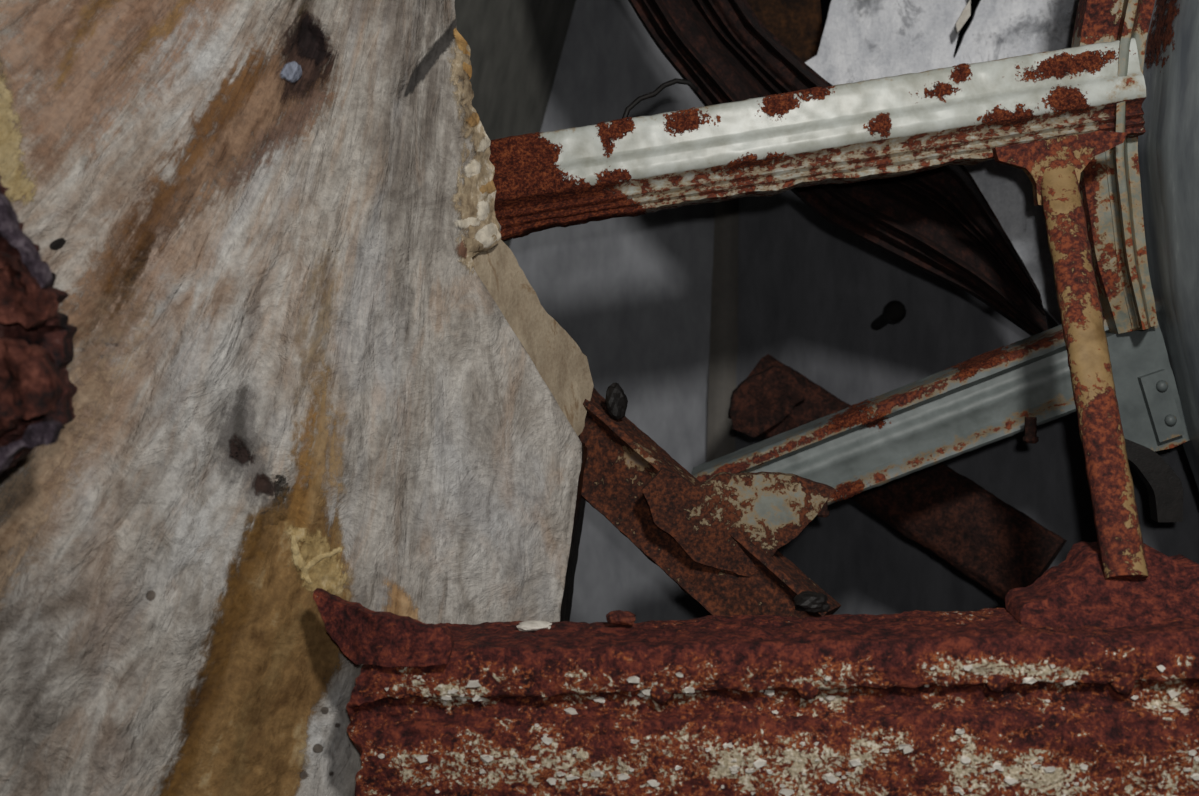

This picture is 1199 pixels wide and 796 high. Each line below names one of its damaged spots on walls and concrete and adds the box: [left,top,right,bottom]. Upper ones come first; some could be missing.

rust [977,0,1180,129]
rust [909,63,973,103]
rust [757,85,836,121]
rust [663,107,721,137]
rust [863,112,892,140]
rust [489,117,649,242]
rust [697,151,803,181]
rust [939,343,1023,378]
rust [815,396,891,433]
rust [829,477,870,503]
rust [384,582,418,620]